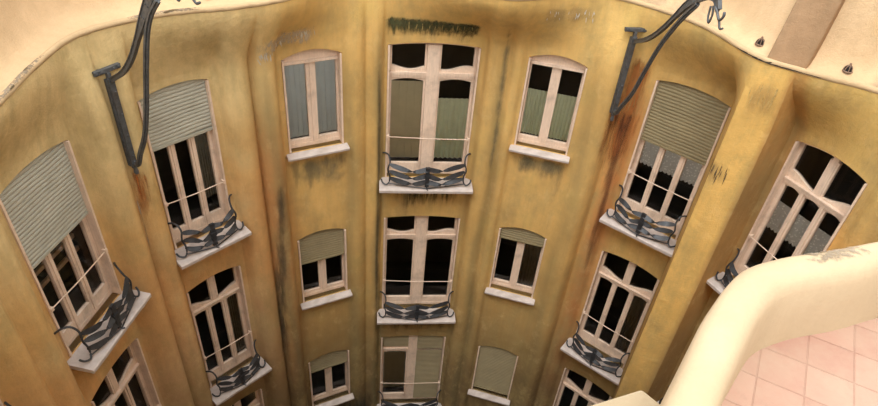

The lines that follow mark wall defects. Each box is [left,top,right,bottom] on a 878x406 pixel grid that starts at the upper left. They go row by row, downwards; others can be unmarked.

rust [600,59,649,164]